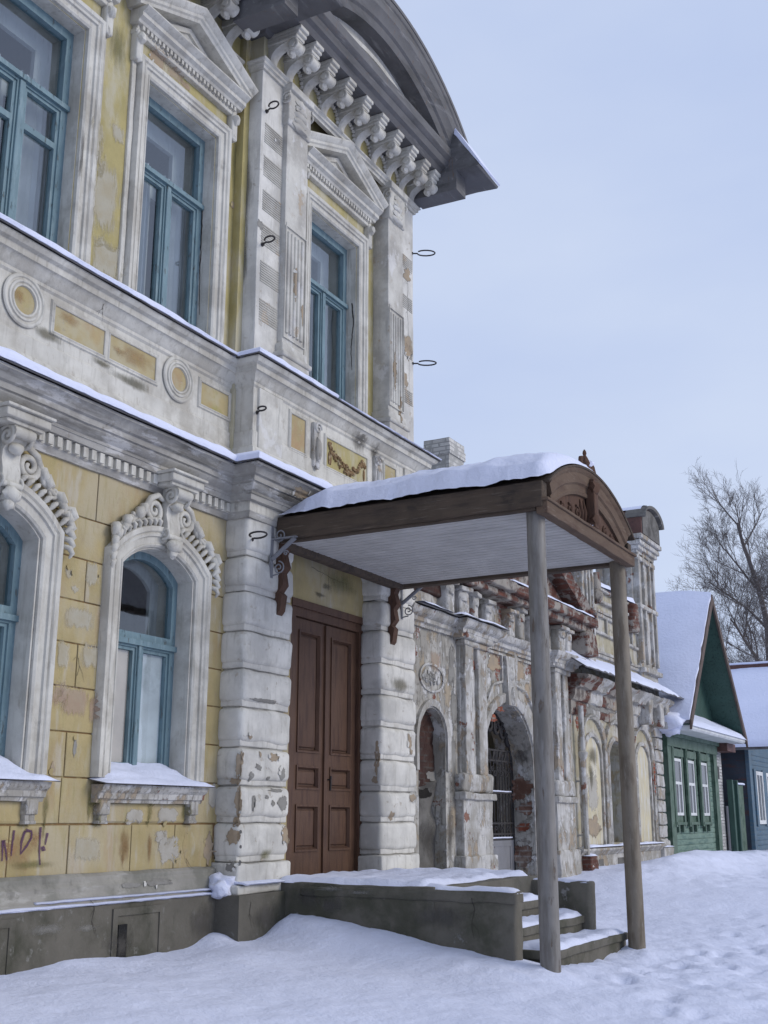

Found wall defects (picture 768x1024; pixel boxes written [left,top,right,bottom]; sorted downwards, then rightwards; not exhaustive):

crack [348,303,356,367]
peeling [53,684,102,720]
flaking render [372,741,380,783]
flaking render [156,808,183,865]
flaking render [225,750,287,872]